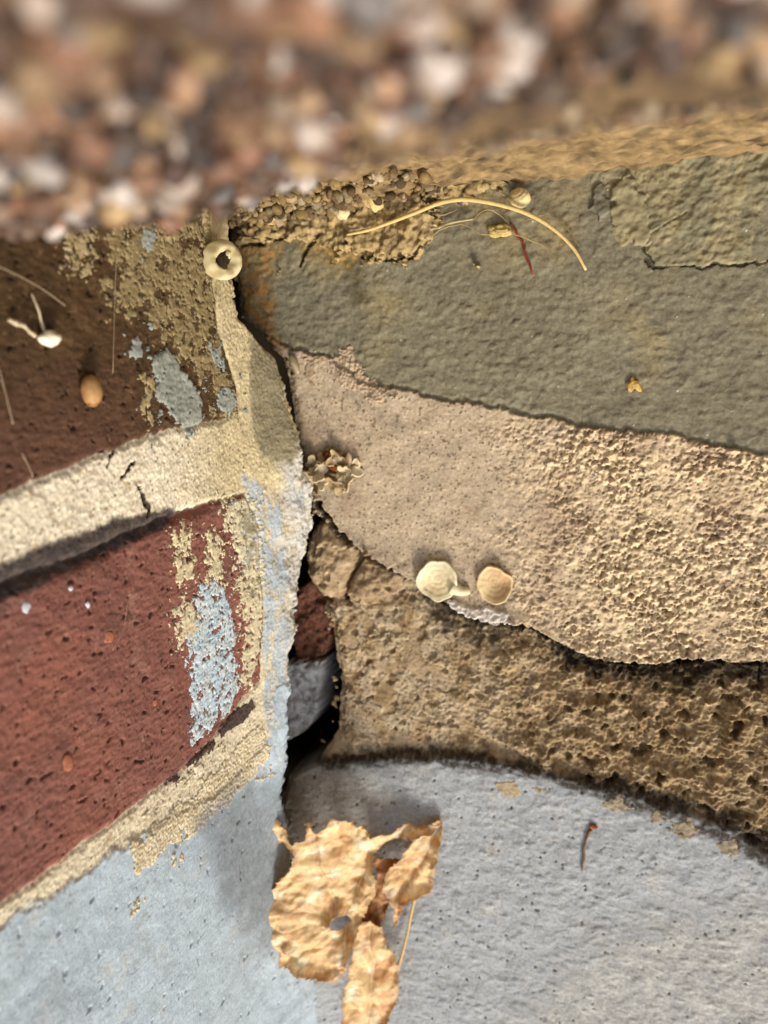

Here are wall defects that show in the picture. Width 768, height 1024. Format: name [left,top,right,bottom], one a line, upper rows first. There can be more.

crack [232,236,312,267]
crack [361,254,414,262]
peeling [55,212,248,451]
crack [272,345,298,403]
crack [106,451,151,514]
crack [312,500,346,536]
crack [507,623,545,646]
crack [280,588,350,796]
spalling [129,476,768,881]
crack [634,658,703,677]
peeling [130,896,146,920]